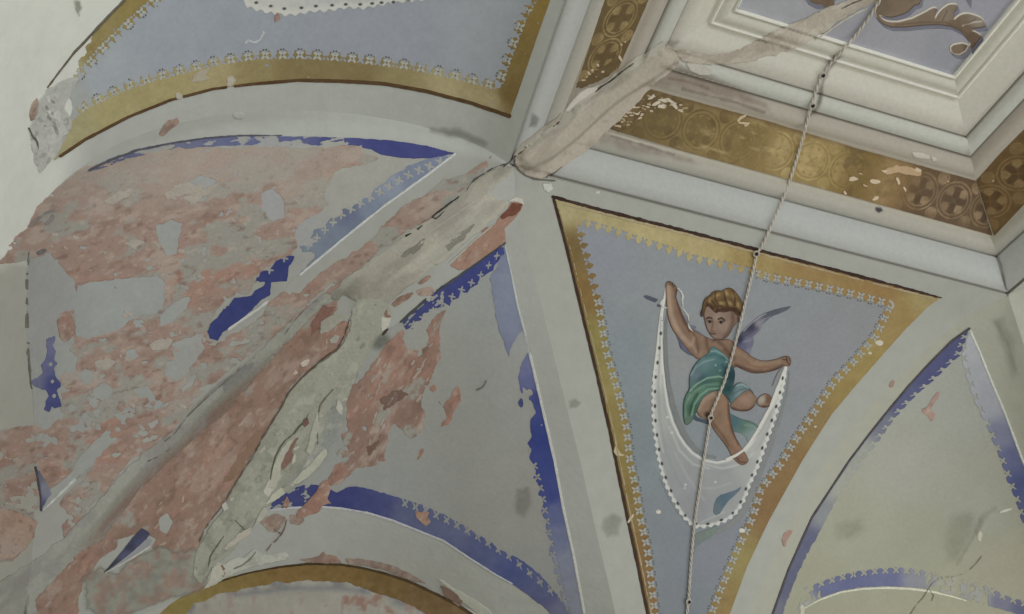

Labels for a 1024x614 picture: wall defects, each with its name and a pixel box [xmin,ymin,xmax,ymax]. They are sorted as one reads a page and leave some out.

flaking render [28,77,79,173]
flaking render [556,41,634,125]
peeling [614,94,688,127]
crack [405,147,562,237]
peeling [449,197,524,270]
peeling [843,170,906,201]
peeling [0,145,492,614]